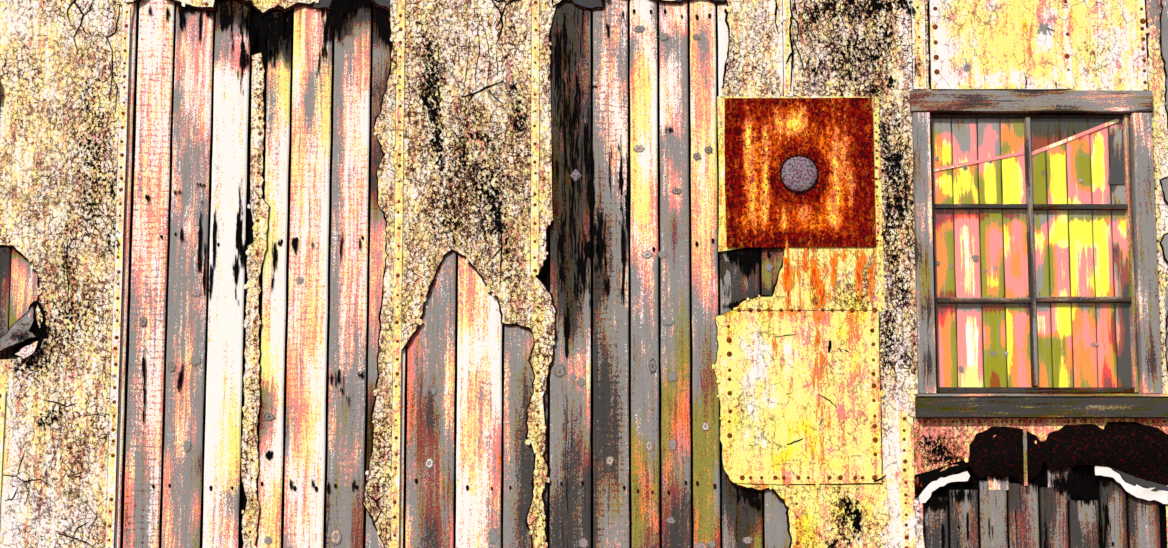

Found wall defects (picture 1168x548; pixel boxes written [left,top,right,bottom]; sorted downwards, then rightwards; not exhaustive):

peeling [169,0,216,11]
peeling [241,63,270,548]
peeling [239,0,335,16]
peeling [362,0,399,548]
leakage [418,25,529,290]
peeling [402,192,557,548]
peeling [712,248,882,548]
corrosion [782,241,875,422]
leakage [826,491,866,548]
leakage [802,0,920,370]
peeling [918,422,1168,548]
peeling [1145,0,1168,118]